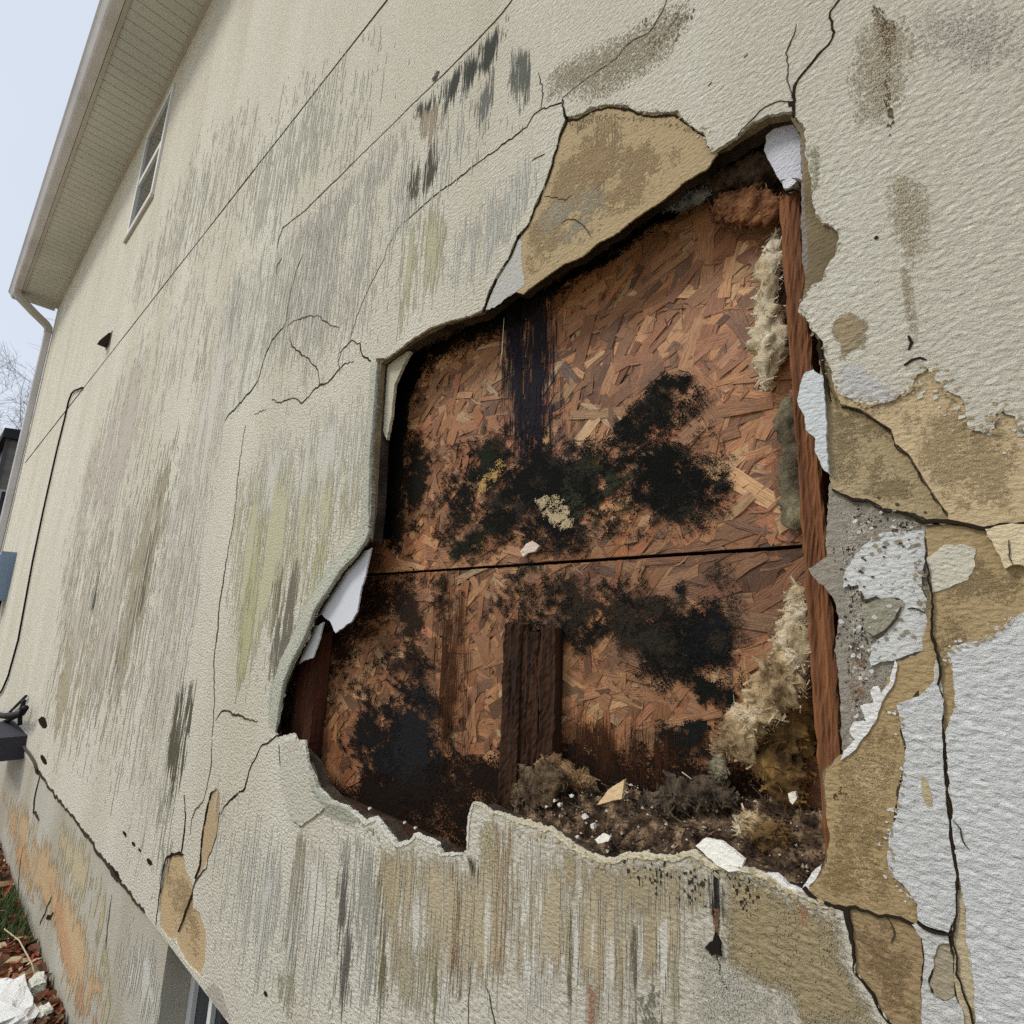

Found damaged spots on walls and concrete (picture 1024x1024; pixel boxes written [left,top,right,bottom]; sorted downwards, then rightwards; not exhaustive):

water stain [441,0,694,304]
spalling [486,101,718,310]
crack [738,0,839,136]
crack [785,187,801,195]
water stain [885,171,933,342]
water stain [42,25,491,957]
crack [32,0,710,957]
water stain [323,210,767,848]
peeling [512,125,1024,1024]
spalling [160,789,220,975]
flaking render [280,739,325,826]
water stain [209,772,882,1024]